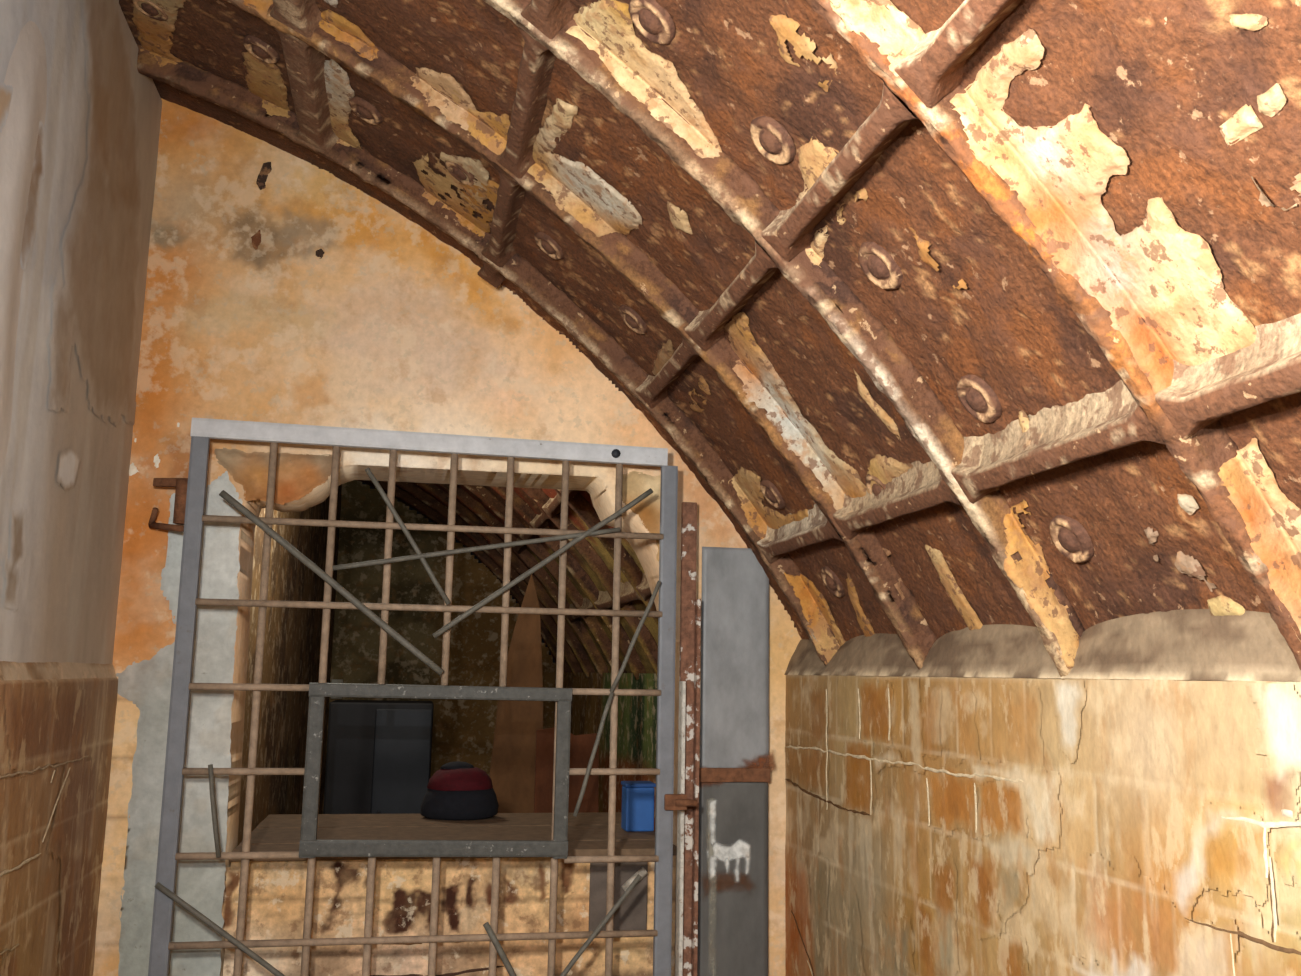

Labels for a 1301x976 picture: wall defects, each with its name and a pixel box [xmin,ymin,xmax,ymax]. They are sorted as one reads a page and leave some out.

corrosion [157,98,224,163]
corrosion [237,177,533,337]
peeling [410,67,510,238]
peeling [566,0,722,159]
peeling [950,29,1257,395]
corrosion [112,212,216,678]
corrosion [634,409,747,548]
peeling [1218,438,1301,642]
damp [786,677,1086,933]
damp [1069,800,1301,976]
crack [1185,867,1301,955]
efflorescence [1246,683,1301,788]